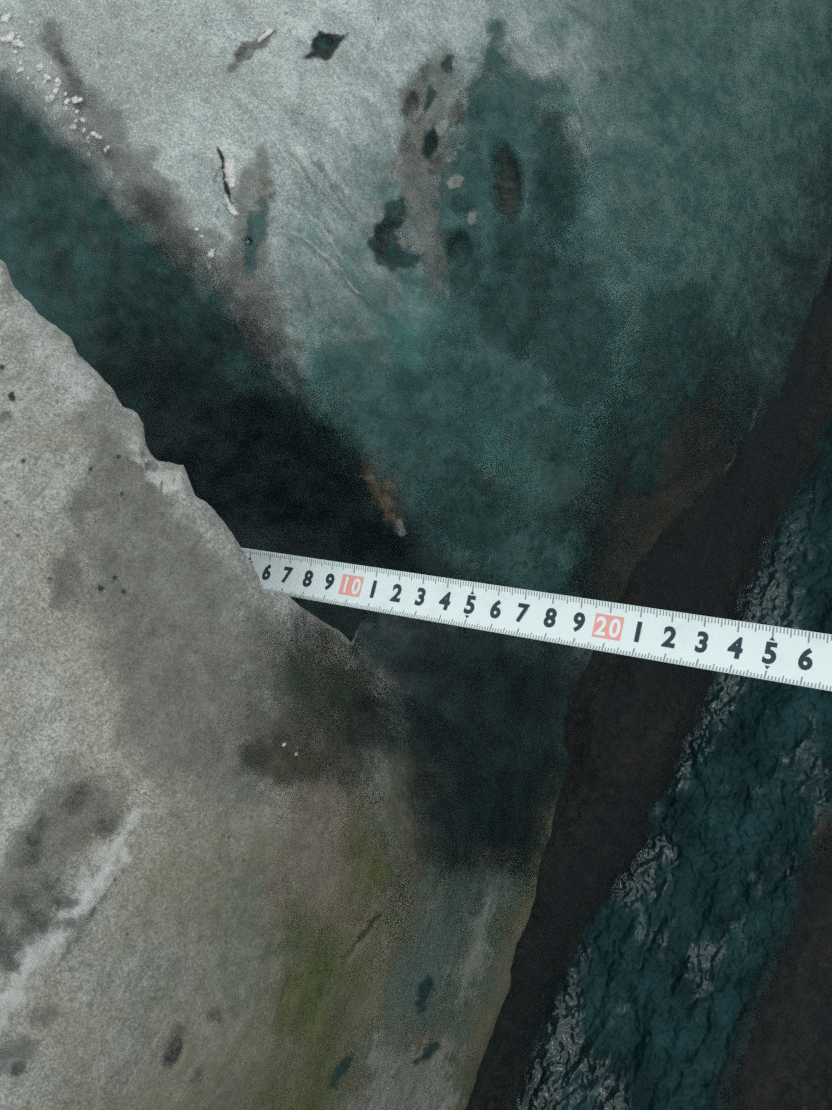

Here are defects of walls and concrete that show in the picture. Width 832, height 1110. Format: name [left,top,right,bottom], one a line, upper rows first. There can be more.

peeling [227,29,274,72]
spalling [305,31,345,60]
crack [214,147,238,215]
spalling [368,196,420,270]
damp [99,0,832,603]
damp [42,824,132,959]
damp [416,976,434,1013]
damp [414,1042,439,1064]